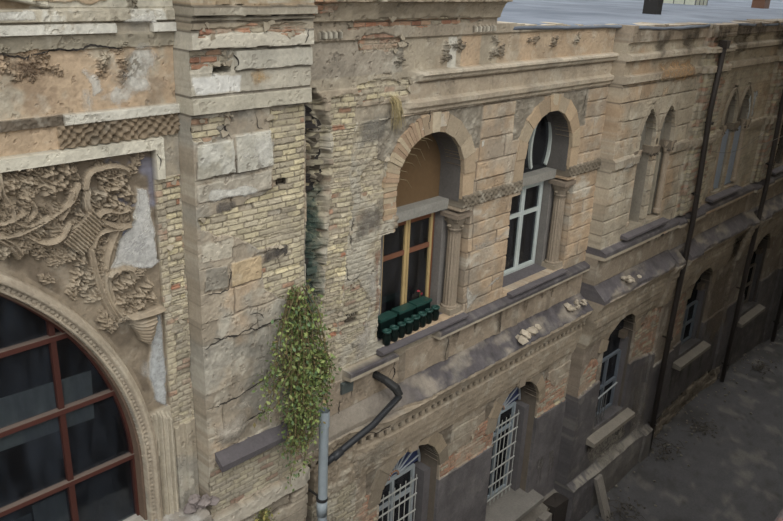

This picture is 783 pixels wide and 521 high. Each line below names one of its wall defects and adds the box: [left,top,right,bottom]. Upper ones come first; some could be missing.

crack [0,44,122,60]
spalling [189,20,305,70]
spalling [313,77,413,370]
spalling [116,176,192,418]
crack [207,309,287,349]
crack [208,376,273,410]
spalling [535,373,568,418]